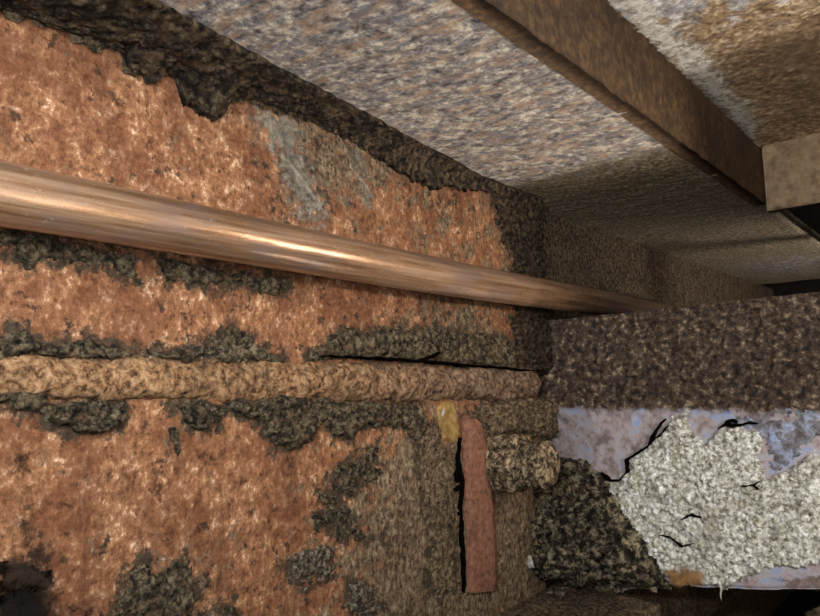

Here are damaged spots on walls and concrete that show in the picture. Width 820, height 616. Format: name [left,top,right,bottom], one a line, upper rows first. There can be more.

peeling [0,8,45,29]
peeling [68,32,107,53]
peeling [122,62,140,78]
crack [319,352,541,371]
peeling [436,401,460,444]
rust [0,544,57,616]